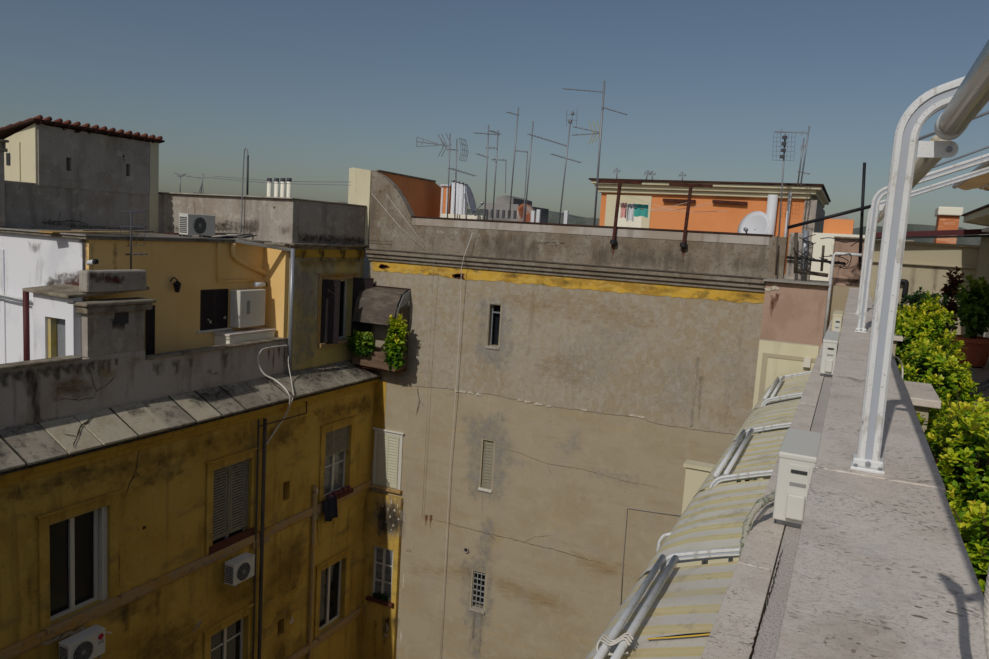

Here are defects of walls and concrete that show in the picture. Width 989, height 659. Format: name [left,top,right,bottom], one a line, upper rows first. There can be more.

crack [53,371,115,446]
crack [432,519,606,565]